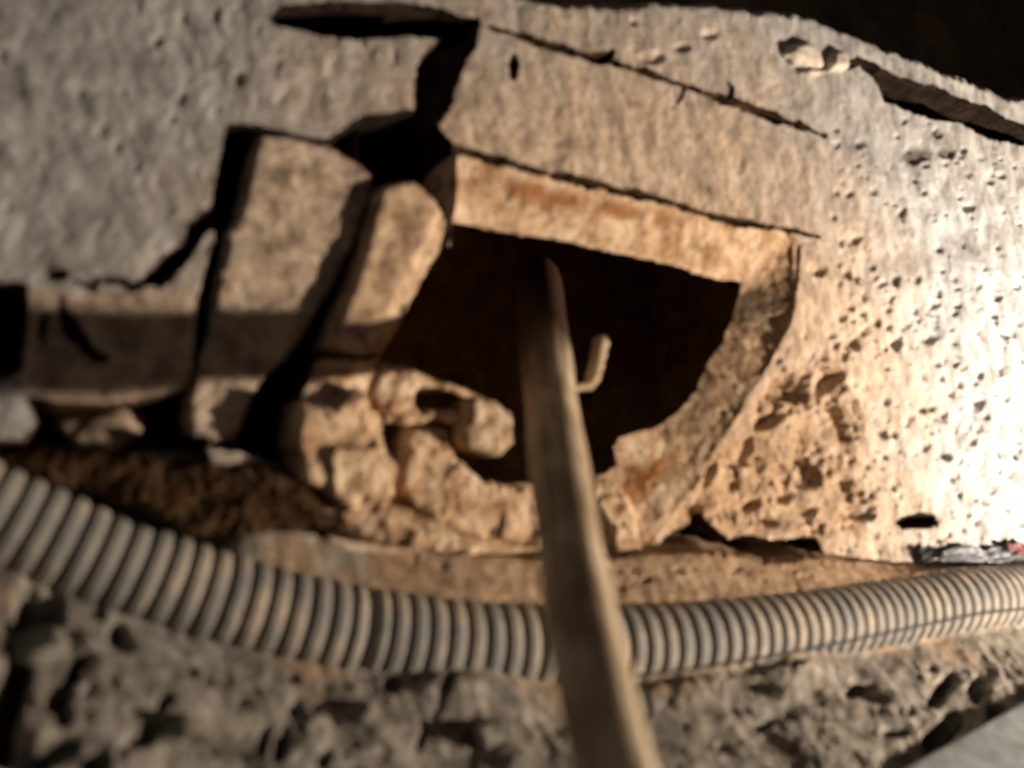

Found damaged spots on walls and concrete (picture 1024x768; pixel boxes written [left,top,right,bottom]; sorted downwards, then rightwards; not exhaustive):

crack [480,24,828,140]
crack [817,54,1024,146]
spalling [192,108,877,546]
spalling [455,532,539,555]